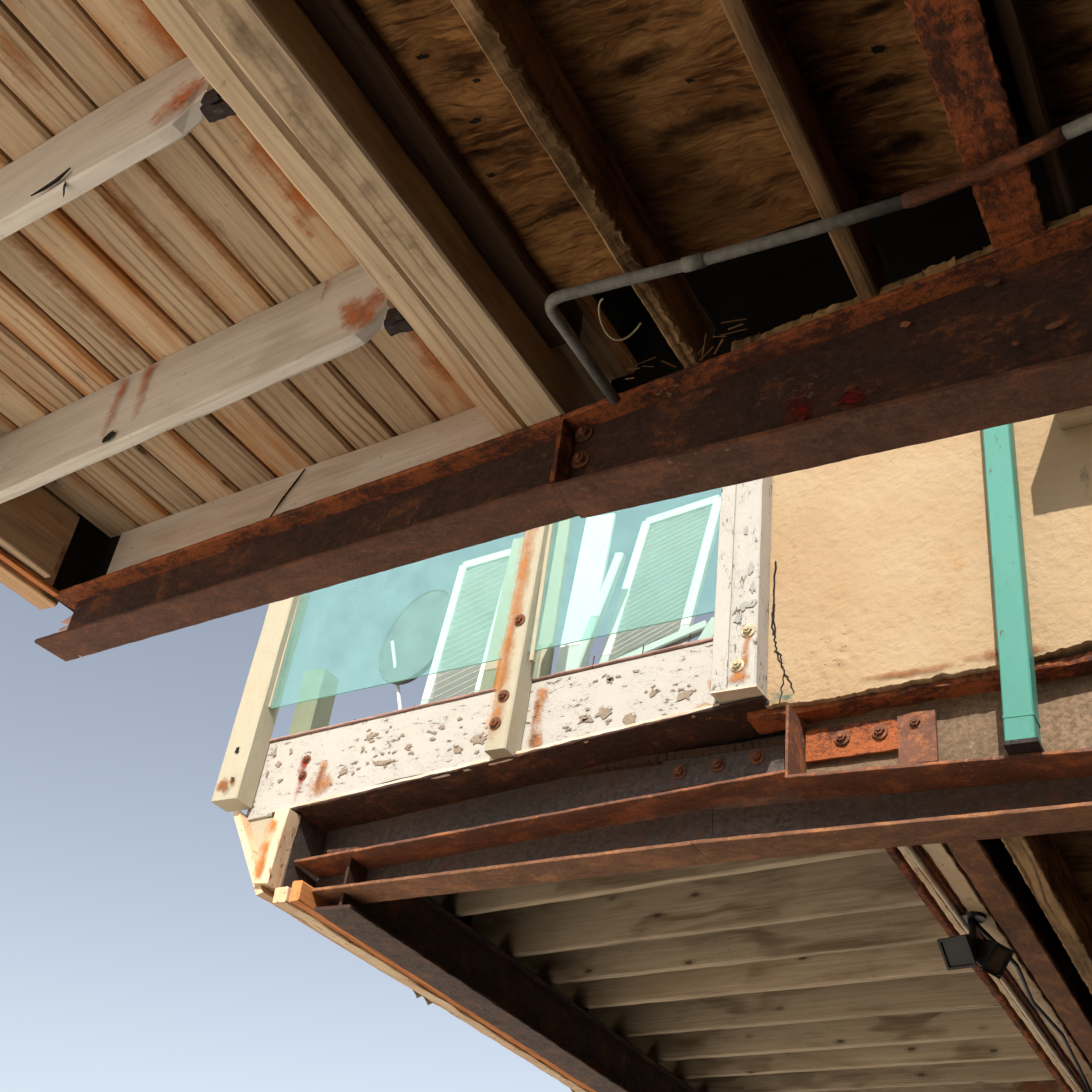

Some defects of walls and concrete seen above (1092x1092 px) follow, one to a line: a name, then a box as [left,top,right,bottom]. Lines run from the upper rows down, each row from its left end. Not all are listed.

rust [151,77,205,120]
crack [30,168,71,196]
rust [287,185,311,236]
rust [342,290,383,326]
rust [505,542,529,651]
rust [730,636,749,681]
peeling [644,683,696,701]
peeling [329,726,414,785]
peeling [453,726,488,754]
rust [529,689,546,748]
peeling [562,706,637,731]
rust [313,762,329,793]